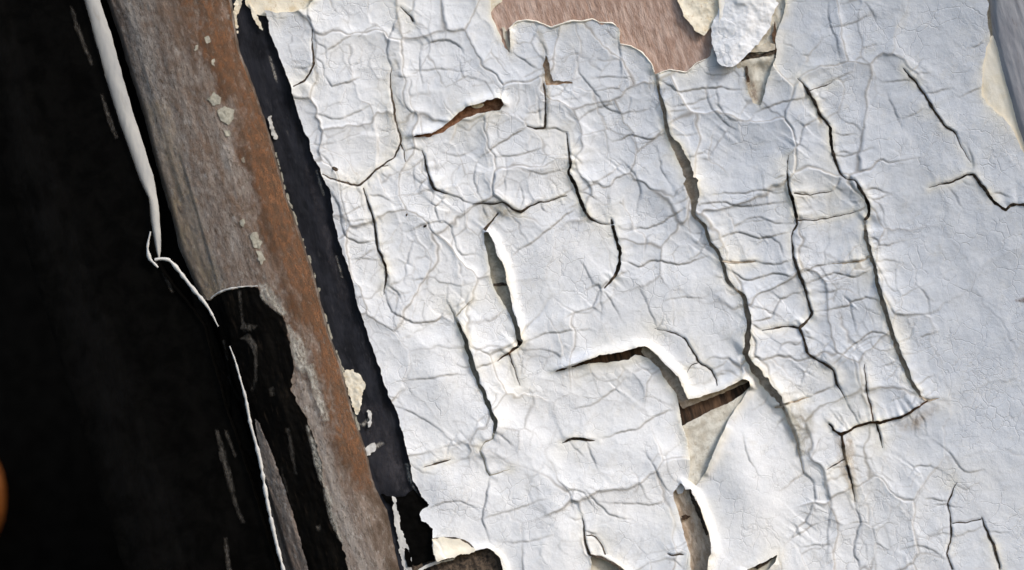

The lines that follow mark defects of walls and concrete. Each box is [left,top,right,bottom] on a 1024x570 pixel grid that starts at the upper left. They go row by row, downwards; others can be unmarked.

rust [181,0,372,489]
crack [323,68,448,290]
peeling [414,98,504,137]
peeling [484,232,523,347]
crack [475,83,622,288]
peeling [491,0,785,106]
crack [555,75,939,500]
crack [903,68,1024,211]
peeling [392,496,475,570]
crack [449,299,523,476]
peeling [673,379,805,570]
crack [946,483,1000,570]